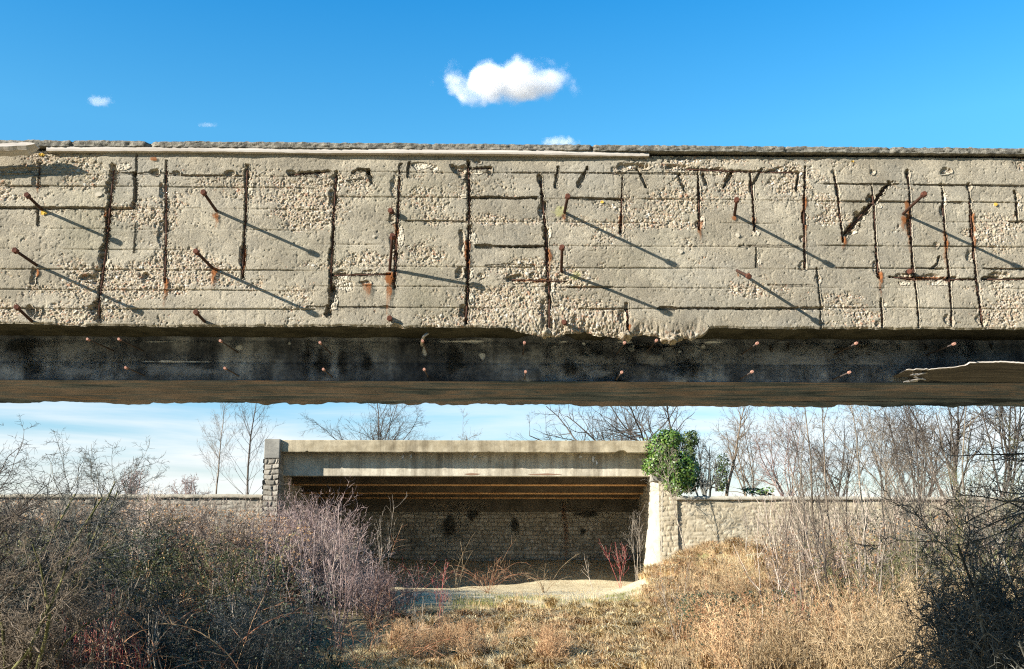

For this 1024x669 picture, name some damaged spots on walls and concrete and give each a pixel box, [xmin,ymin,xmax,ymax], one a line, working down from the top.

spalling [221,170,252,181]
peeling [537,202,548,234]
peeling [853,192,875,222]
rust [901,200,910,237]
peeling [455,229,485,279]
peeling [86,304,102,318]
spalling [509,299,709,345]
damp [304,350,347,376]
damp [443,340,483,371]
damp [553,345,610,377]
damp [843,348,911,368]